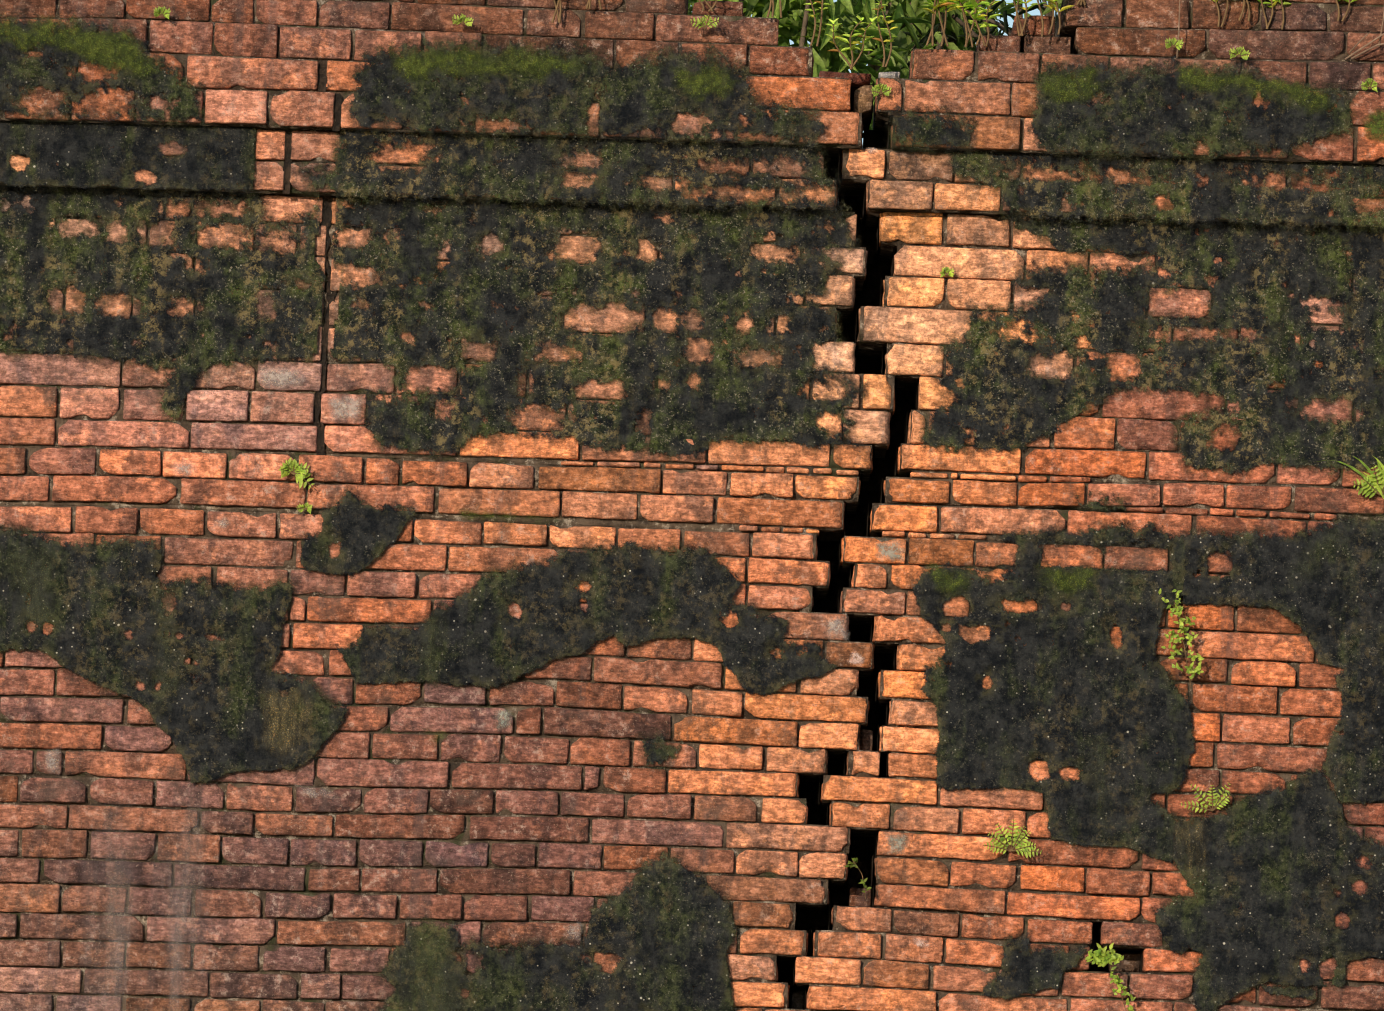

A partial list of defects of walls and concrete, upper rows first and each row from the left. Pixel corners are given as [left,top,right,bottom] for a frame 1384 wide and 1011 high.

crack [778,82,918,1009]